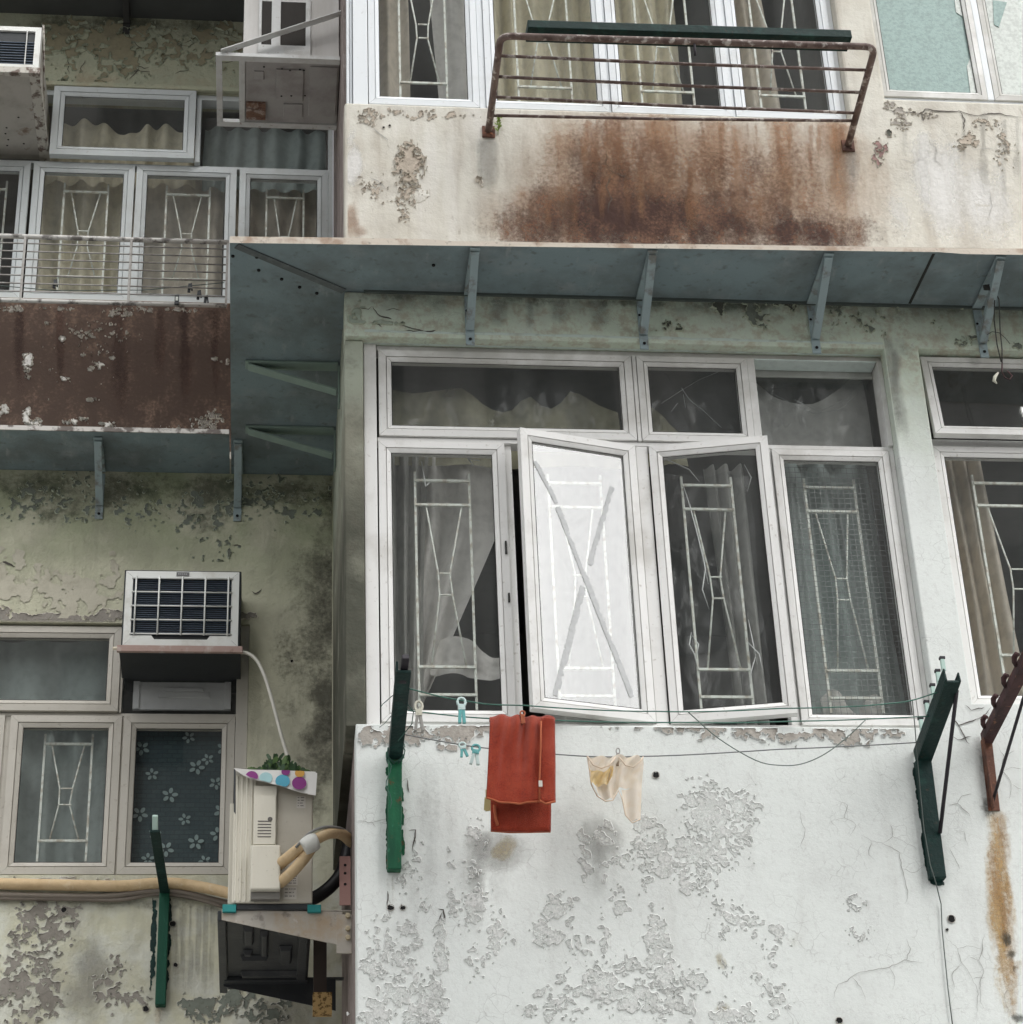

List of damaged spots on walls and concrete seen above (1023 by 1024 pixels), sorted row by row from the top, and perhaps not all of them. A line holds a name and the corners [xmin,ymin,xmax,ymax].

peeling [30,15,243,84]
peeling [358,139,428,223]
corrosion [499,122,863,246]
flaking render [871,100,939,168]
corrosion [0,297,231,452]
damp [307,553,332,781]
flaking render [634,727,906,748]
peeling [517,772,795,1024]
crack [837,801,922,903]
corrosion [988,817,1012,978]
peeling [0,901,83,1024]
crack [834,939,922,996]